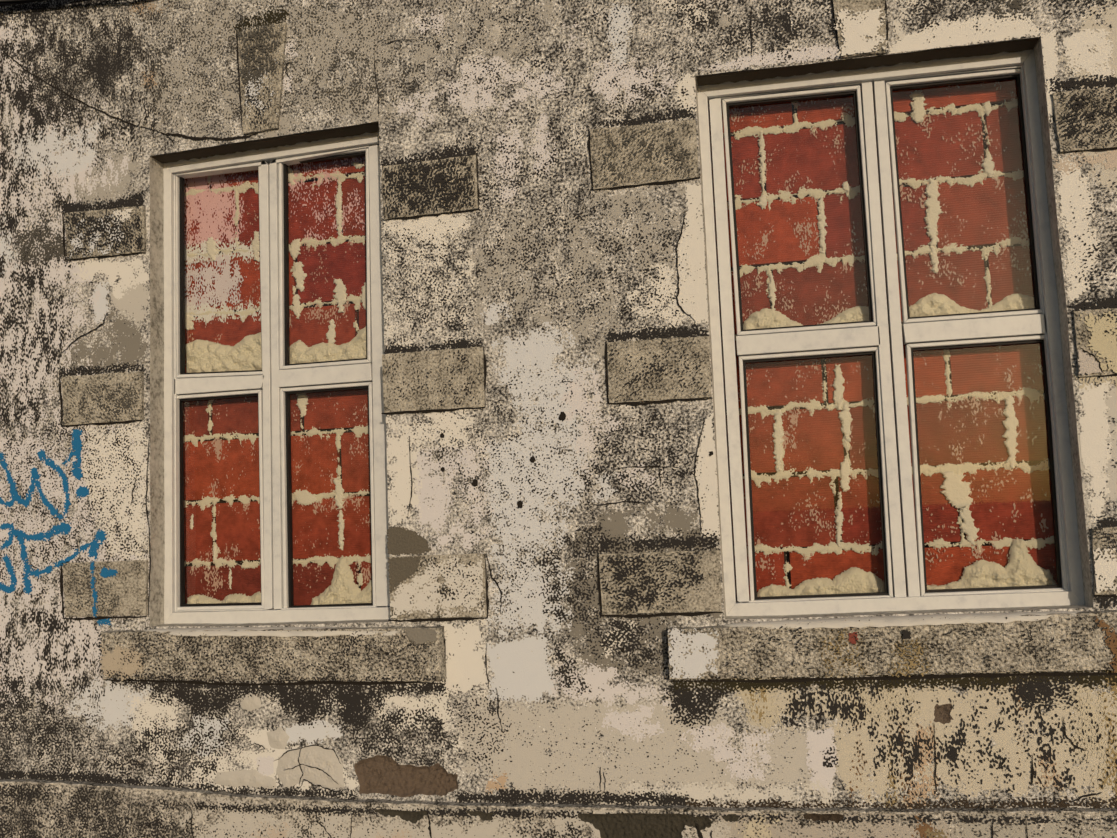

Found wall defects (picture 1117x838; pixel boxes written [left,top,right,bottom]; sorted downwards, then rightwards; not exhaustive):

peeling [588,0,1117,131]
flaking render [179,113,1117,838]
crack [425,812,433,838]
crack [999,755,1034,786]